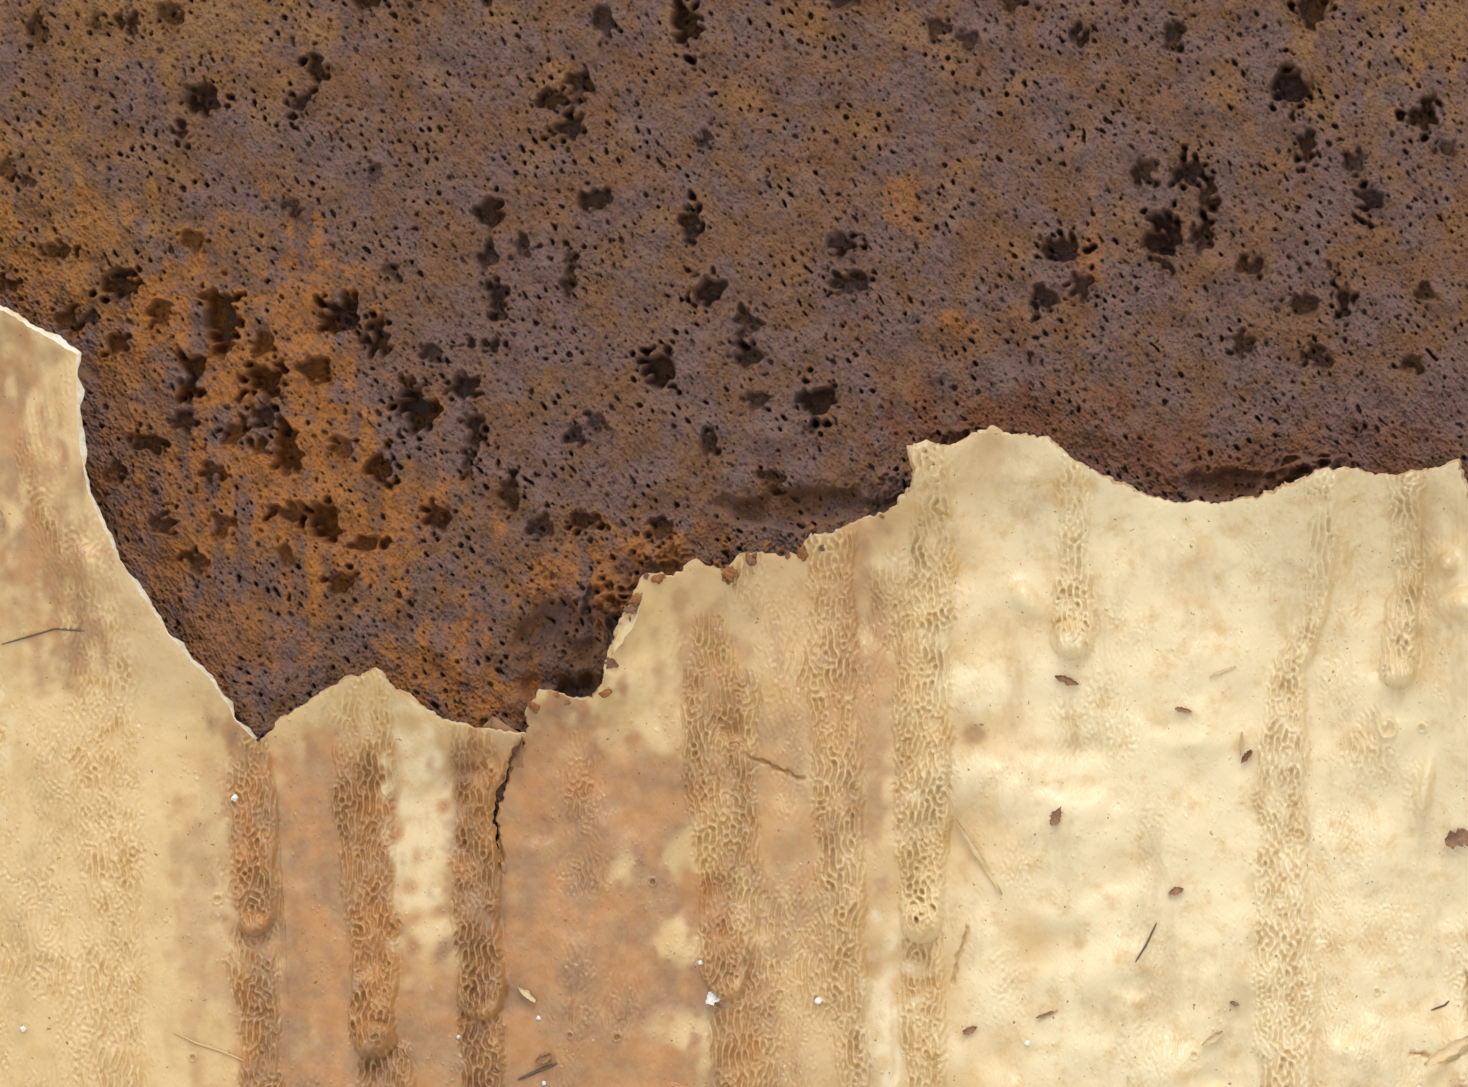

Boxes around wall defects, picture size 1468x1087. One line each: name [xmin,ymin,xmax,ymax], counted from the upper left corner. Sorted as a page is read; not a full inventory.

spalling [671,0,706,67]
spalling [1268,49,1319,174]
rust [1360,0,1468,134]
spalling [327,187,532,493]
rust [882,172,931,240]
spalling [1029,230,1101,325]
rust [1075,168,1115,285]
spalling [1130,145,1223,285]
rust [0,0,802,1087]
peeling [0,265,1468,1087]
rust [845,345,1457,919]
rust [752,689,826,990]